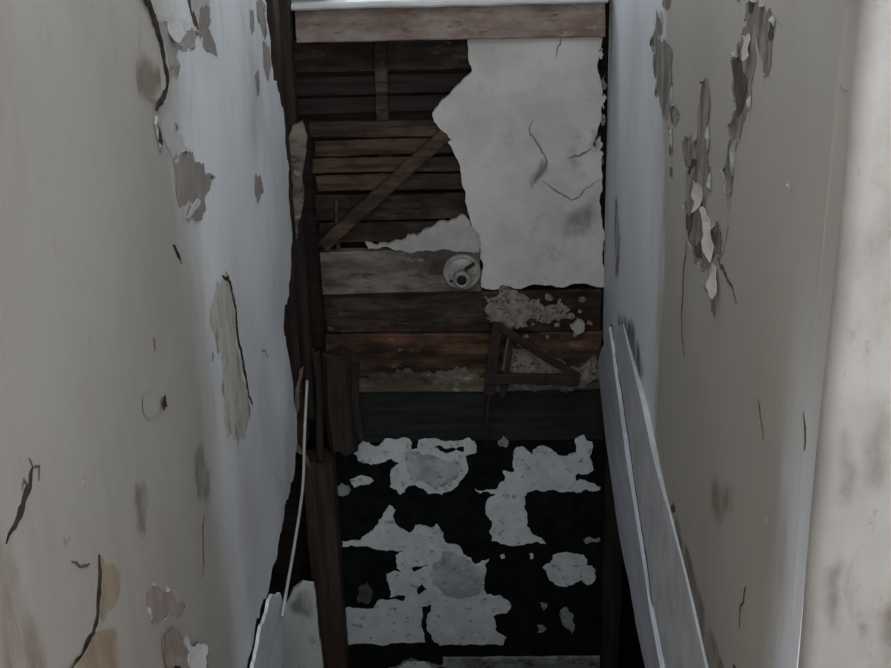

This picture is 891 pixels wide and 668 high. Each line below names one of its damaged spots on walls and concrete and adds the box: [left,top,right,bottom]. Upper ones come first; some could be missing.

peeling [160,0,218,84]
peeling [161,113,215,222]
crack [529,118,600,201]
peeling [649,0,775,317]
peeling [210,272,253,445]
spalling [484,285,599,393]
crack [6,458,40,544]
peeling [338,475,373,496]
peeling [354,437,477,495]
peeling [475,434,600,559]
peeling [342,505,511,668]
peeling [543,552,596,587]